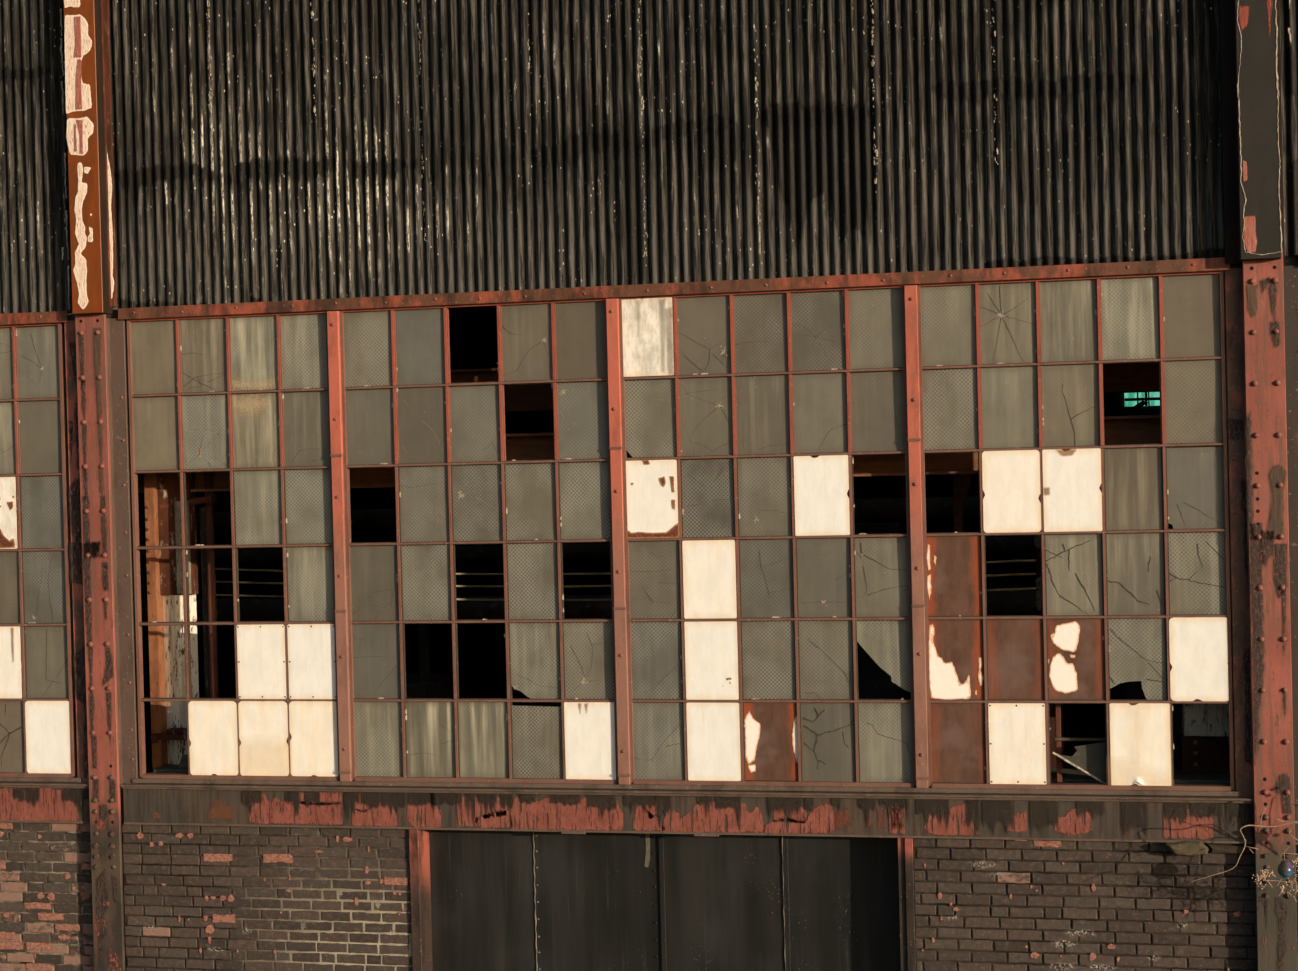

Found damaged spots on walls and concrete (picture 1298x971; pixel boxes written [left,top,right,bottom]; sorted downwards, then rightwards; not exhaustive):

peeling [60,0,94,315]
water stain [755,101,878,269]
rust [0,529,15,548]
peeling [924,803,979,836]
peeling [1008,808,1092,865]
peeling [1163,808,1214,839]